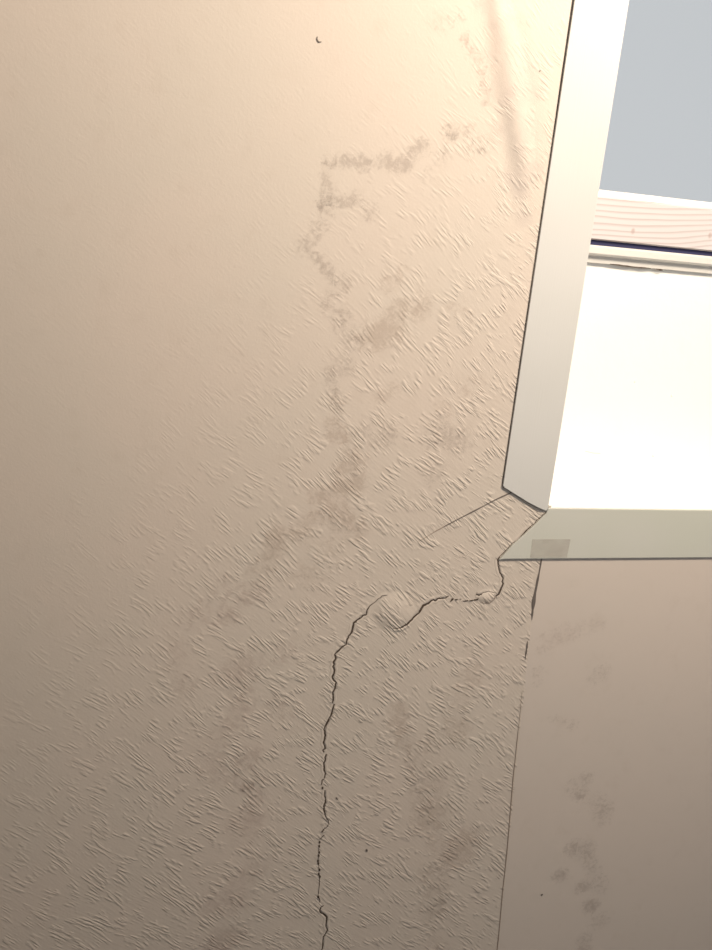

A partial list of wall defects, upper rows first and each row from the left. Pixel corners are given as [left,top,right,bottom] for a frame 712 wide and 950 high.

crack [418,492,512,542]
crack [393,505,551,631]
crack [316,592,387,950]